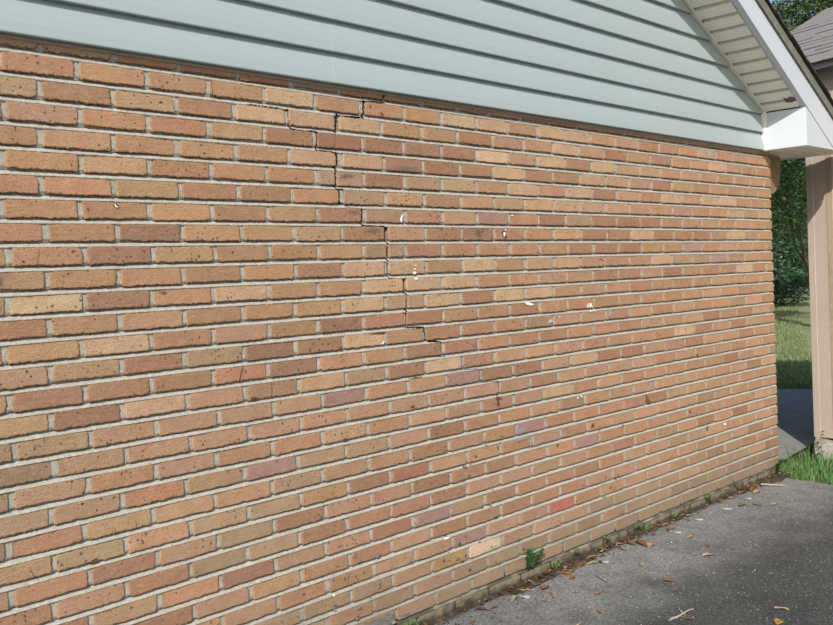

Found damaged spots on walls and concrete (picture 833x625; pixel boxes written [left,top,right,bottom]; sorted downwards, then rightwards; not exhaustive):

crack [247,96,499,396]